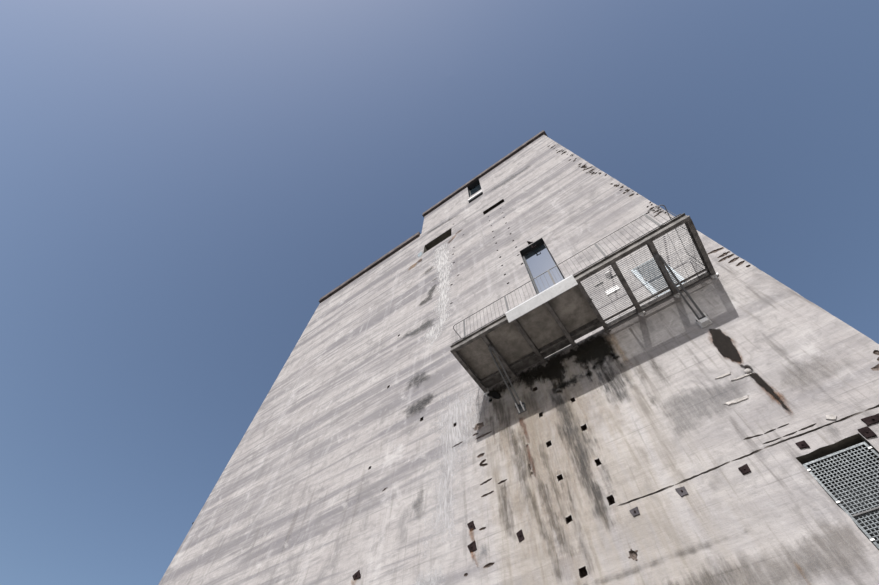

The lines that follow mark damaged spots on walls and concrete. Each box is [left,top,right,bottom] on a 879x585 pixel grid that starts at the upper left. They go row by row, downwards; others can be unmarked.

damp [409,395,432,414]
damp [436,394,480,529]
damp [487,334,626,471]